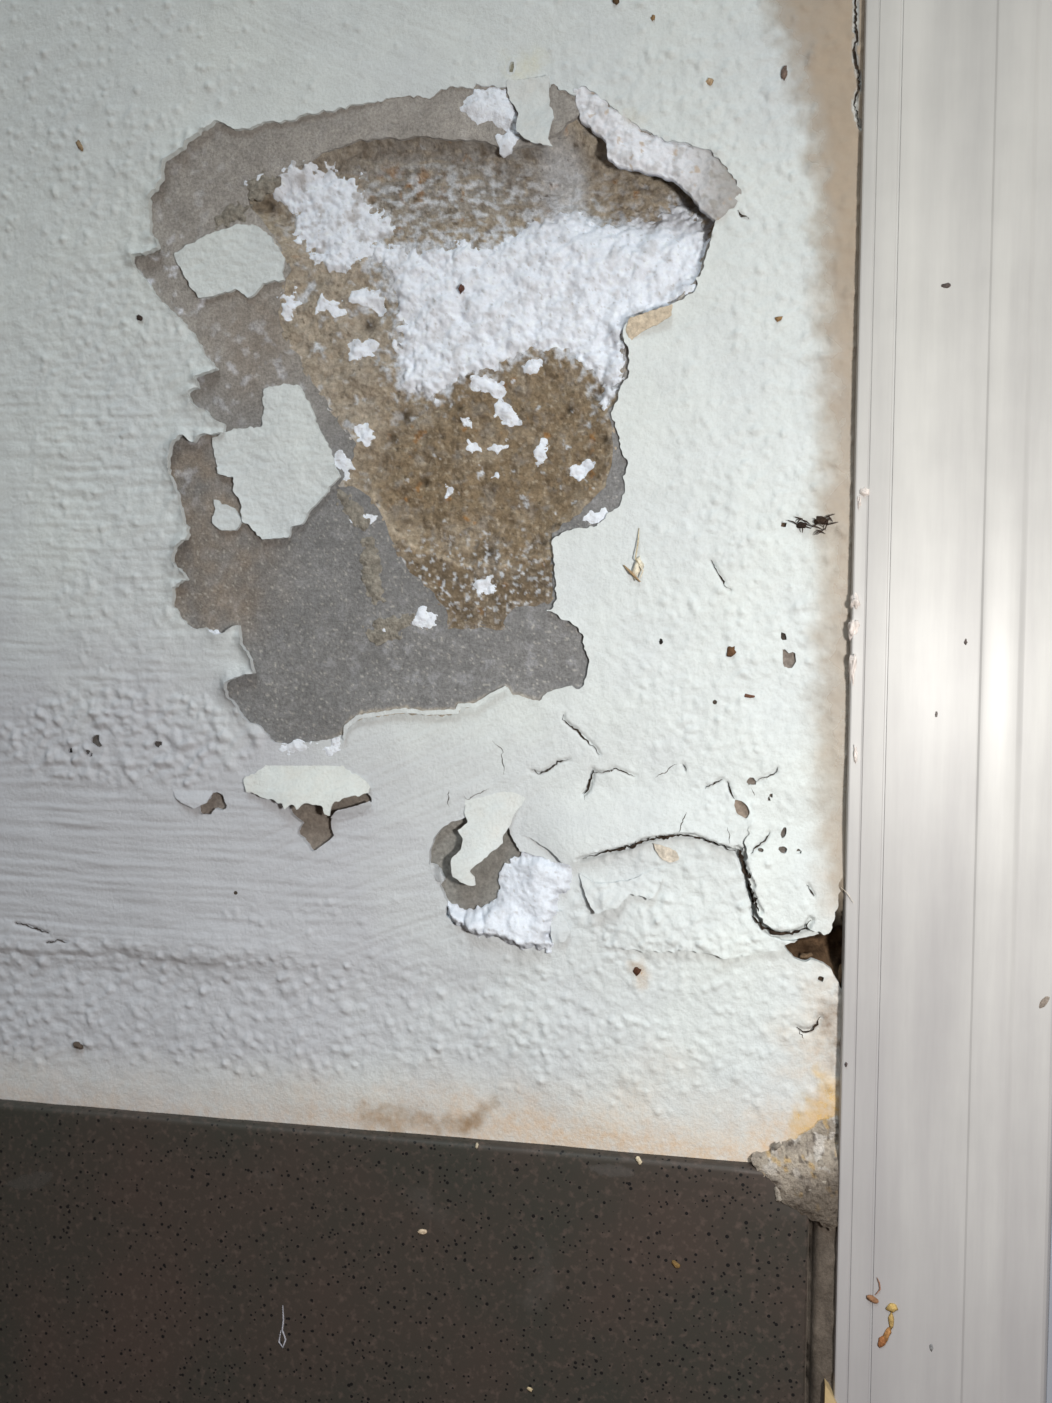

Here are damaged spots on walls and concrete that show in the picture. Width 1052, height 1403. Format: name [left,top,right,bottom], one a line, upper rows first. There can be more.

water stain [777,0,865,466]
spalling [135,64,742,850]
water stain [827,488,853,663]
peeling [430,792,679,953]
crack [447,715,814,935]
peeling [734,800,750,818]
peeling [758,827,801,853]
spalling [785,879,843,988]
water stain [838,808,846,885]
spalling [751,1115,839,1231]